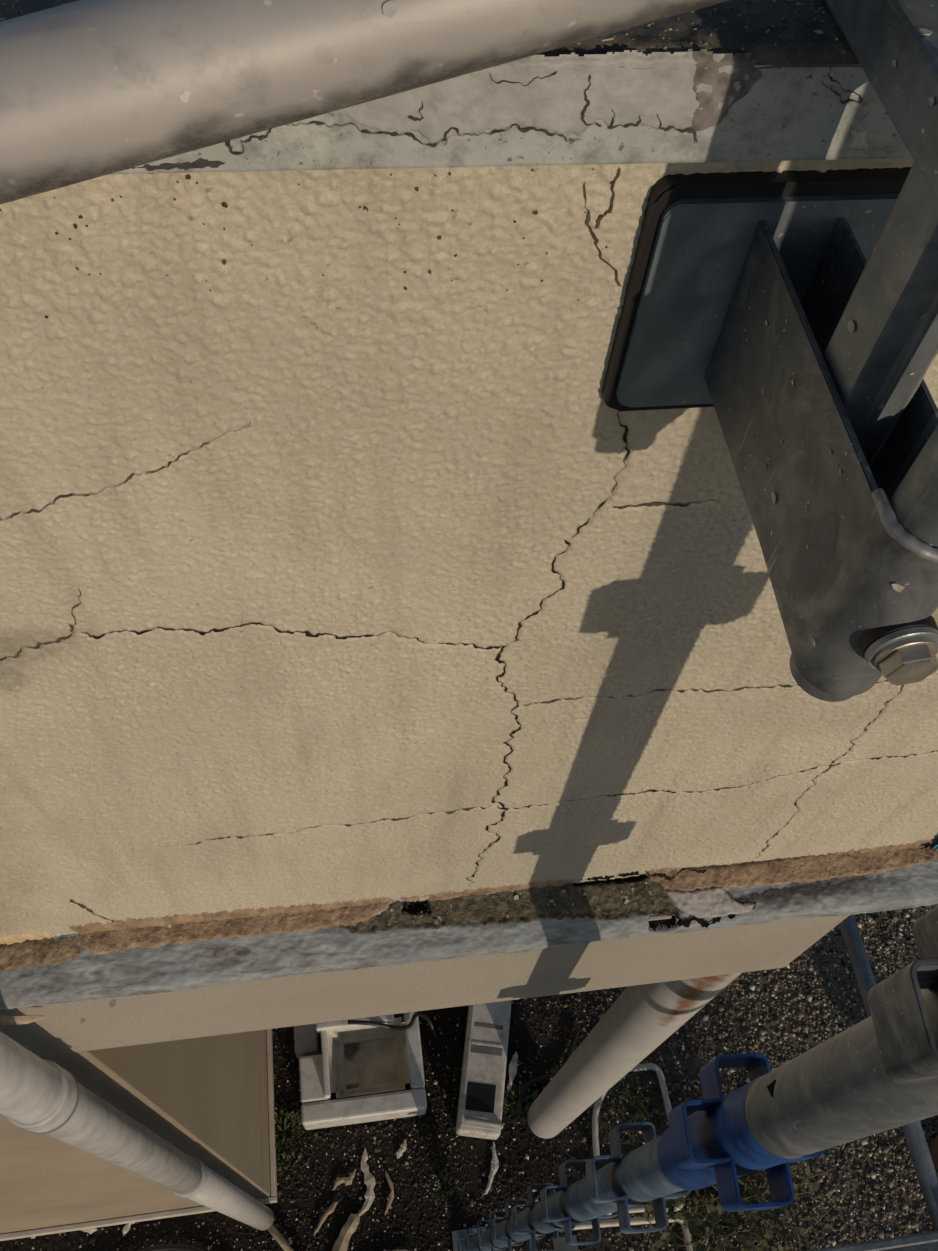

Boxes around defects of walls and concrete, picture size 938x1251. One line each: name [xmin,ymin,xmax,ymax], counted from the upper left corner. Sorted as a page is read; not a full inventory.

peeling [287,50,755,147]
crack [821,66,863,104]
peeling [126,129,271,174]
crack [584,168,622,287]
crack [0,411,938,887]
crack [70,900,114,922]
spalling [0,838,938,972]